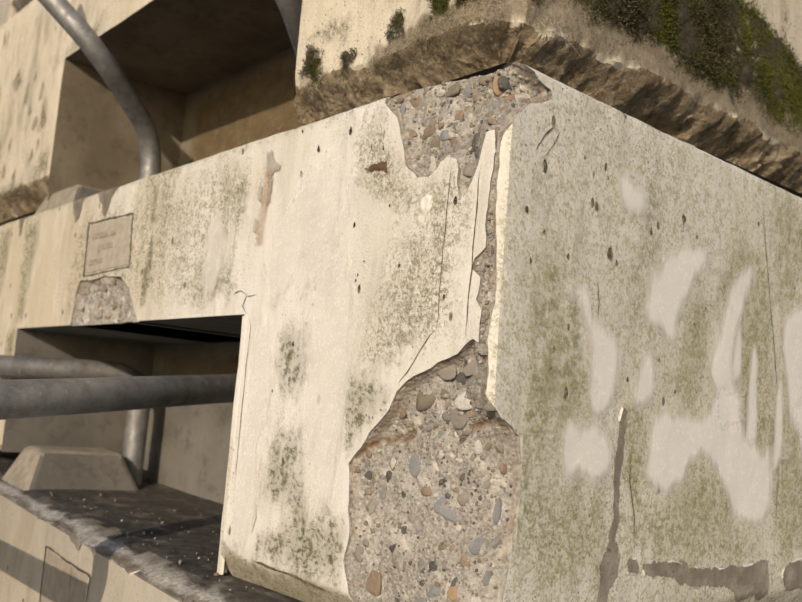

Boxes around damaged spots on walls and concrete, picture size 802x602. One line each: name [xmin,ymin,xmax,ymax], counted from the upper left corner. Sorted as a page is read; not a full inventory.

spalling [71,276,141,326]
corrosion [253,151,280,243]
corrosion [364,161,387,172]
crack [398,171,451,383]
spalling [346,63,548,602]
peeling [597,407,802,602]